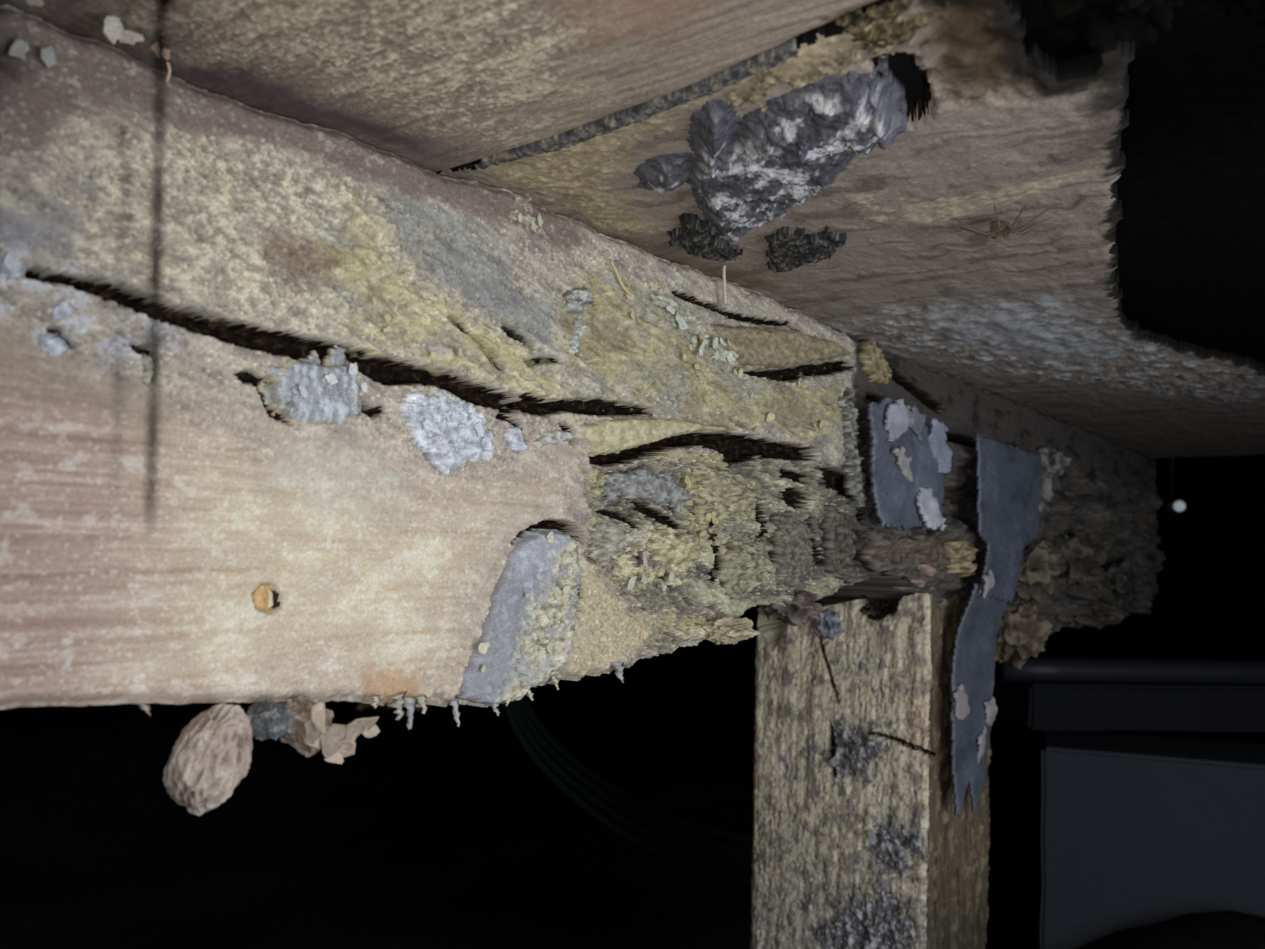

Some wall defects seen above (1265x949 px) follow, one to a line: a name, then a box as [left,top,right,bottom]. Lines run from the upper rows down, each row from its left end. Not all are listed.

crack [737,339,975,449]
crack [24,271,866,563]
peeling [699,495,719,537]
peeling [625,547,675,591]
crack [707,522,720,581]
peeling [815,609,845,640]
peeling [478,641,491,673]